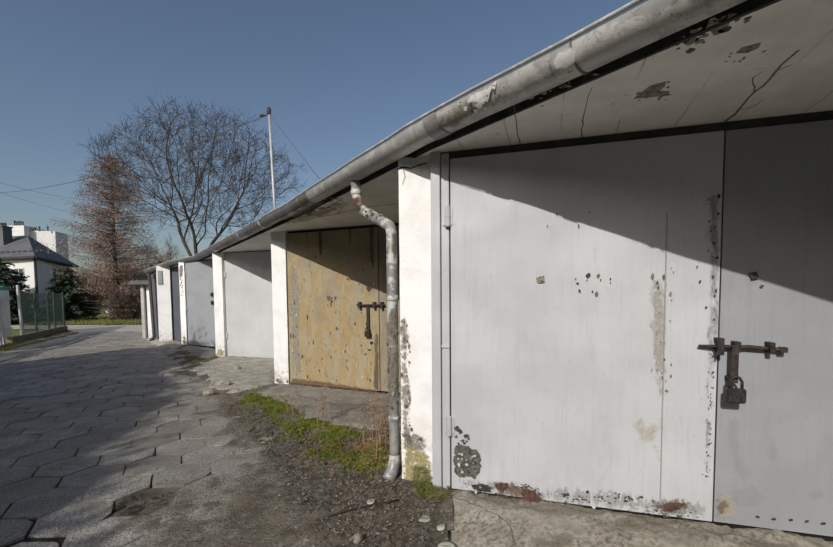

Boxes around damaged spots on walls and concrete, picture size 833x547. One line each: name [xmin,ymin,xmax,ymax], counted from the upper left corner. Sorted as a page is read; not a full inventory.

peeling [676,13,752,54]
peeling [725,43,767,62]
peeling [458,81,505,117]
crack [580,88,592,138]
peeling [634,81,672,101]
crack [725,50,800,122]
peeling [385,309,413,442]
damp [402,433,424,451]
peeling [453,426,508,497]
corrosion [494,482,542,502]
peeling [514,484,649,514]
corrosion [647,499,691,516]